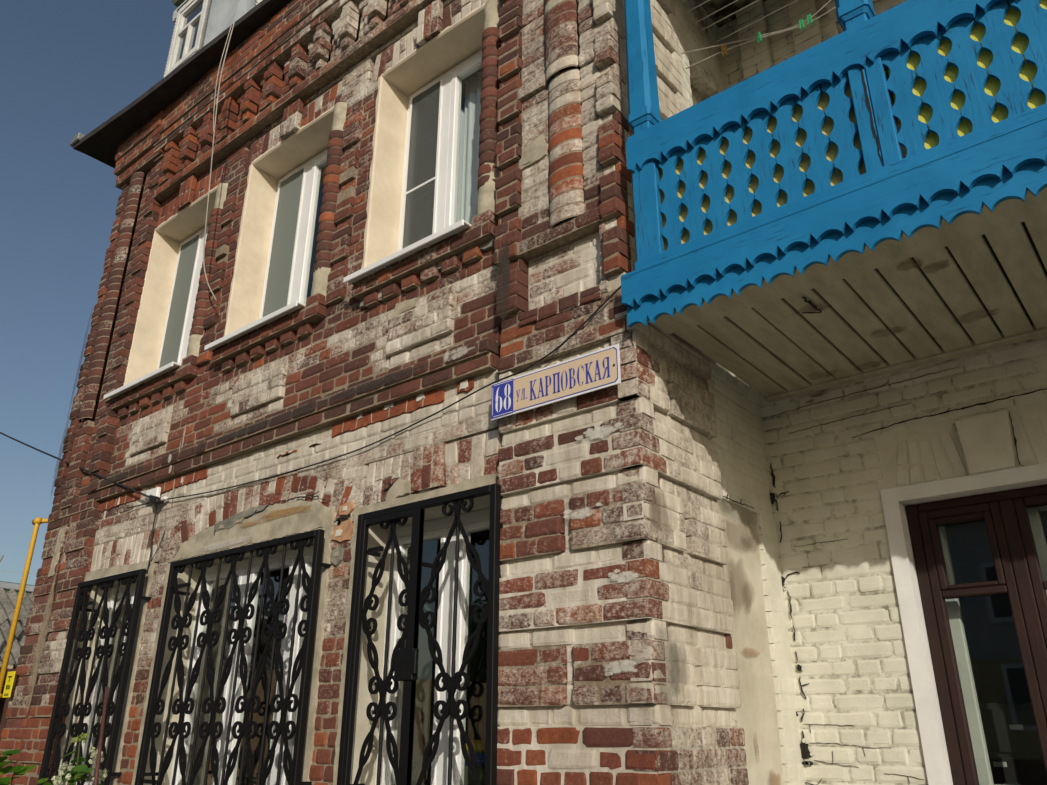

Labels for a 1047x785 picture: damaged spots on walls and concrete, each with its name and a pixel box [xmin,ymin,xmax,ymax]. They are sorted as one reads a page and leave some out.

crack [774,366,1047,467]
flaking render [214,504,267,531]
crack [723,463,891,785]